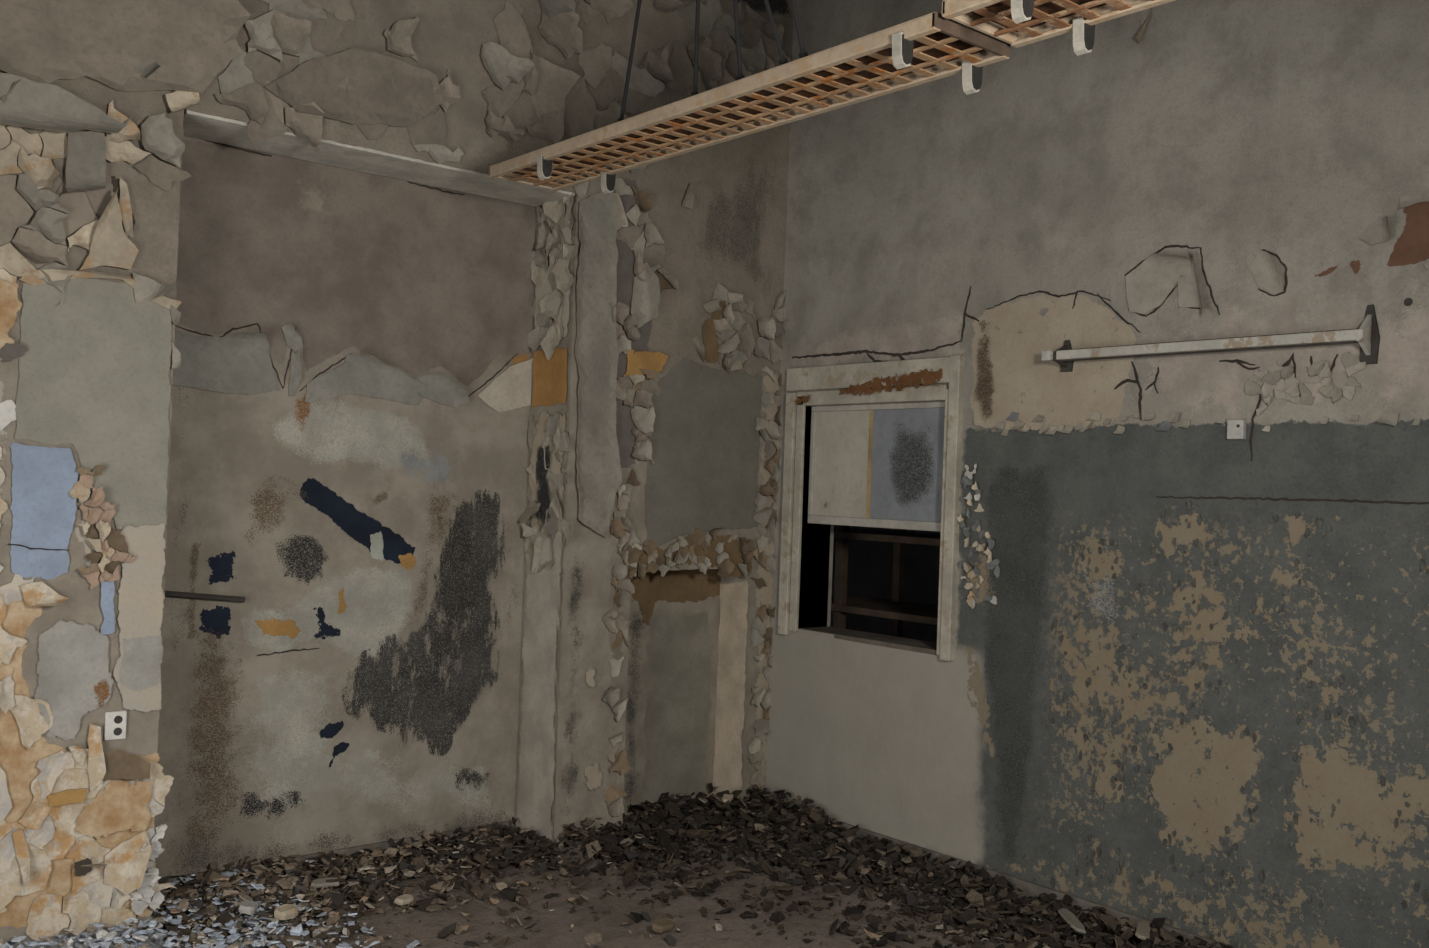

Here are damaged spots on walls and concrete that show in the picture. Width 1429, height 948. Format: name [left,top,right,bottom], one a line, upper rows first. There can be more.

flaking render [0,0,791,589]
corrosion [839,368,943,398]
crack [792,245,1220,420]
spalling [584,165,1429,816]
damp [983,464,1058,862]
peeling [986,501,1429,948]